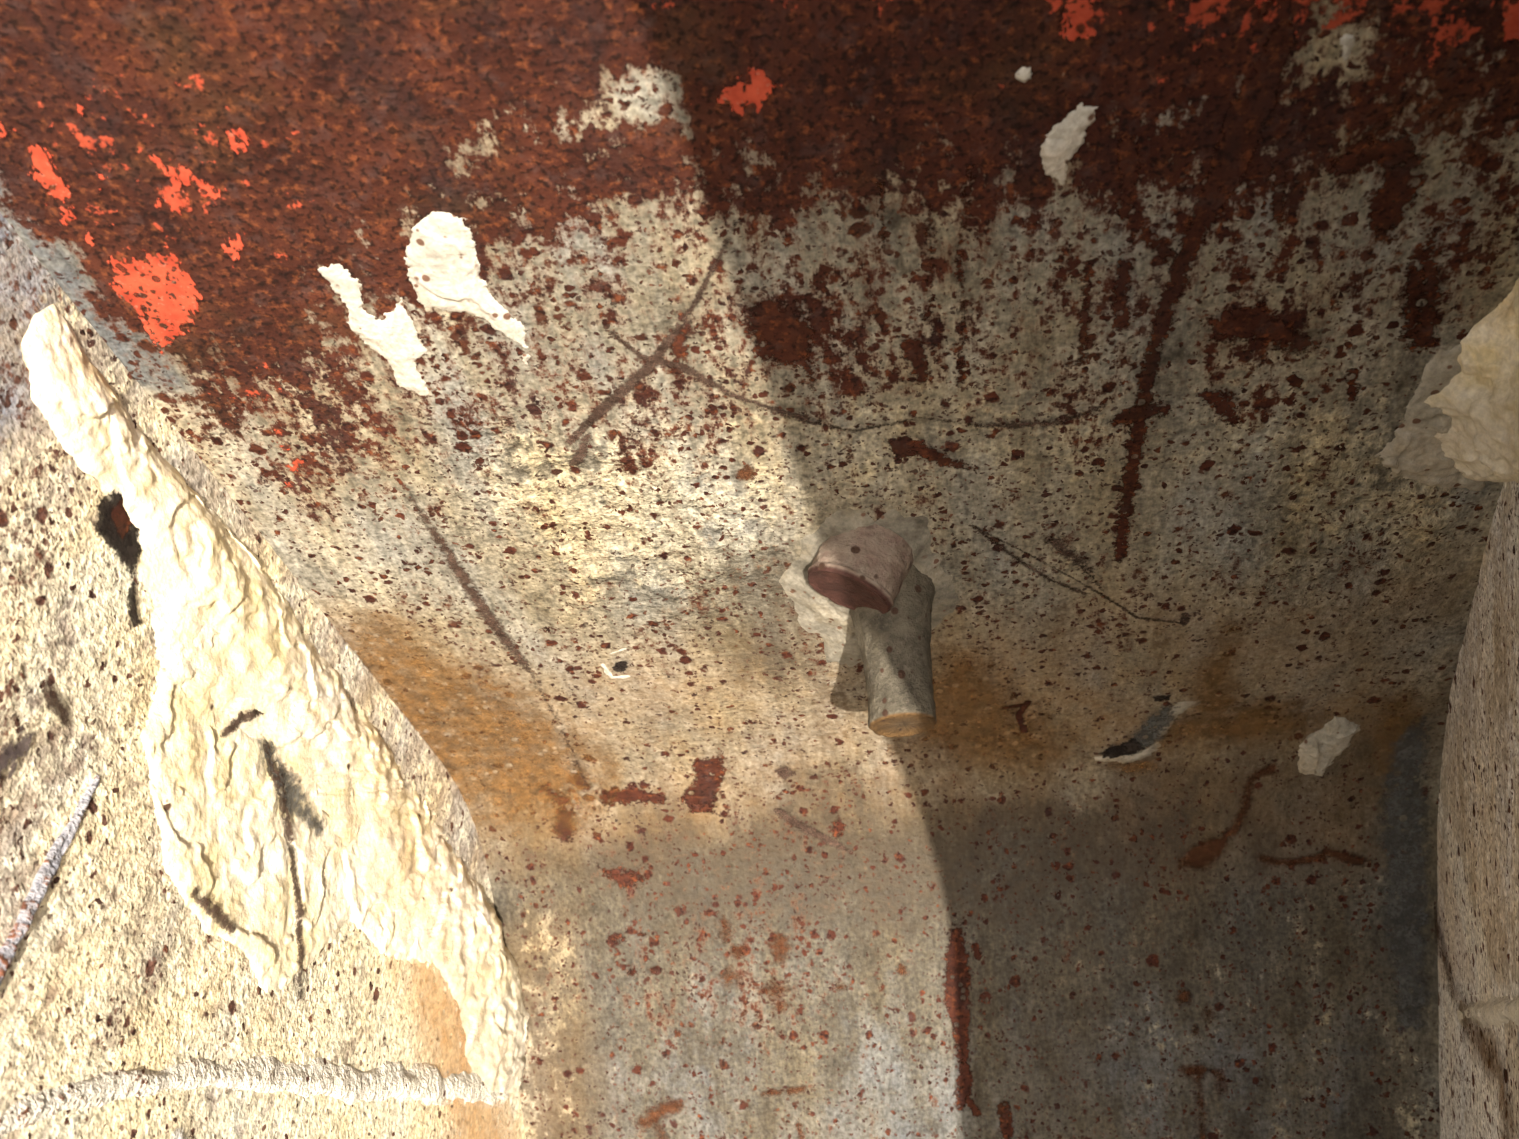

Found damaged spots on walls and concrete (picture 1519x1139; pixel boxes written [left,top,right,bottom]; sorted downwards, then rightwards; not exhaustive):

rust [1325,95,1426,233]
rust [664,317,696,381]
rust [739,292,819,391]
rust [899,165,976,388]
rust [1074,263,1096,367]
rust [1107,21,1298,563]
rust [1200,299,1321,356]
rust [1285,374,1304,389]
rust [1343,366,1361,404]
rust [1398,228,1448,354]
rust [888,433,979,471]
rust [942,923,1014,1139]